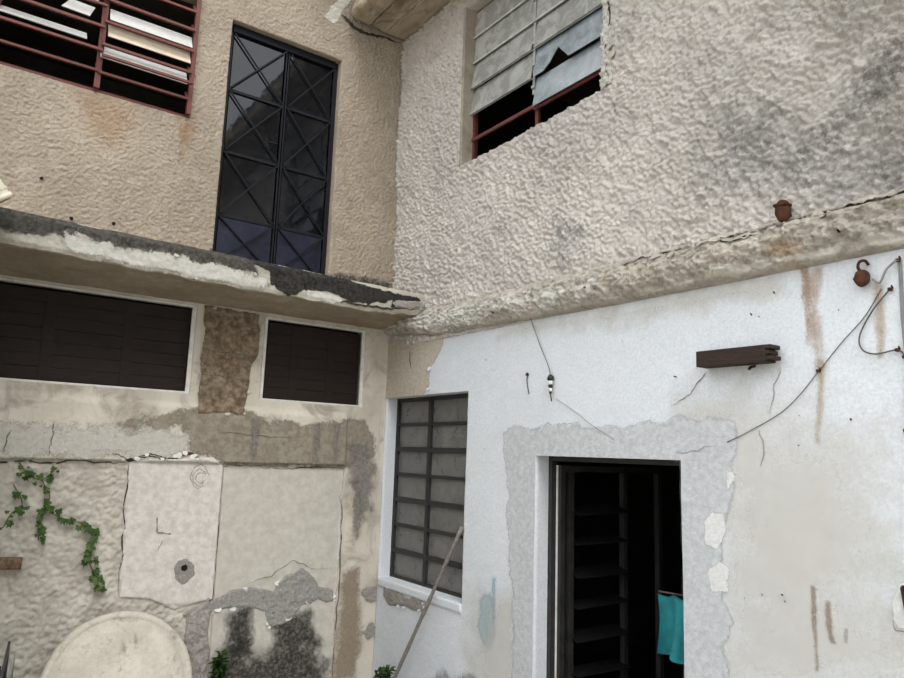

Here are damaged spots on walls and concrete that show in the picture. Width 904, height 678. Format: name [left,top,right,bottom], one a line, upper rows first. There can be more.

flaking render [325,0,351,24]
crack [619,190,904,266]
peeling [62,231,270,291]
peeling [306,290,343,304]
flaking render [0,305,375,678]
peeling [704,512,726,549]
peeling [708,561,729,593]